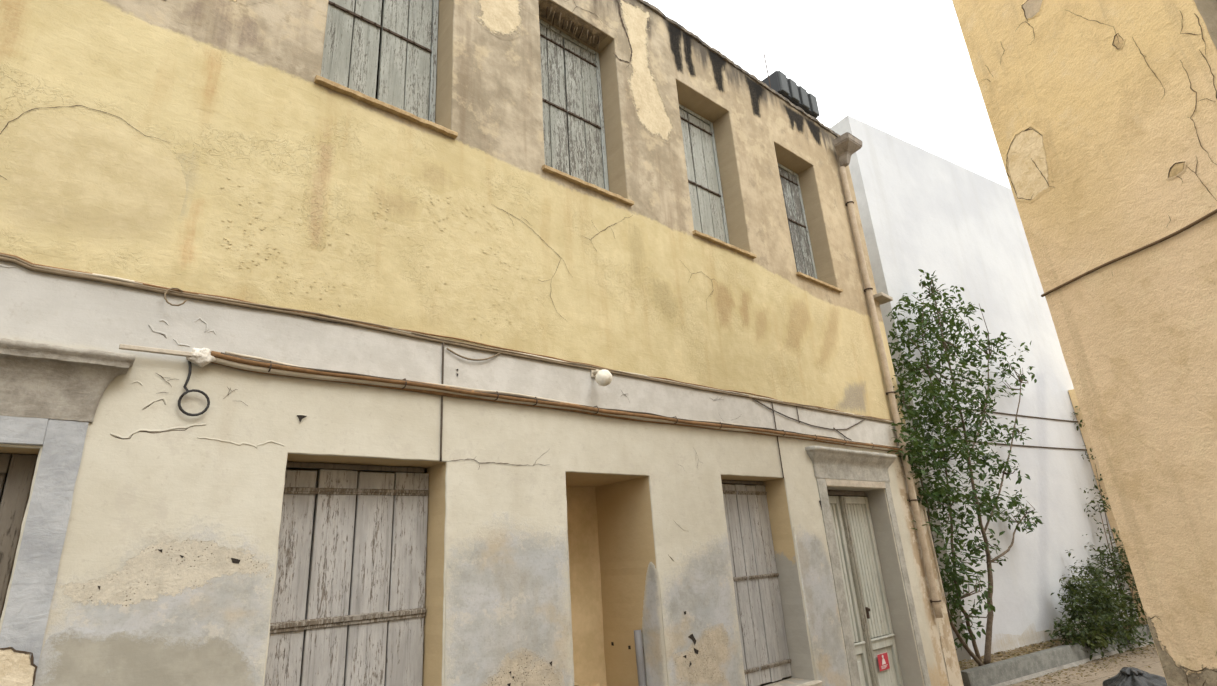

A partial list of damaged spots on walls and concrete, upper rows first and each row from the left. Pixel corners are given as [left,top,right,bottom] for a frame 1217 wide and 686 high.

peeling [474,0,607,50]
peeling [617,0,676,145]
leakage [666,20,728,94]
leakage [744,74,766,119]
spalling [1004,124,1056,204]
spalling [1016,0,1045,45]
crack [1066,10,1217,201]
peeling [0,514,277,686]
peeling [444,511,602,686]
peeling [642,520,746,686]
peeling [793,523,851,686]